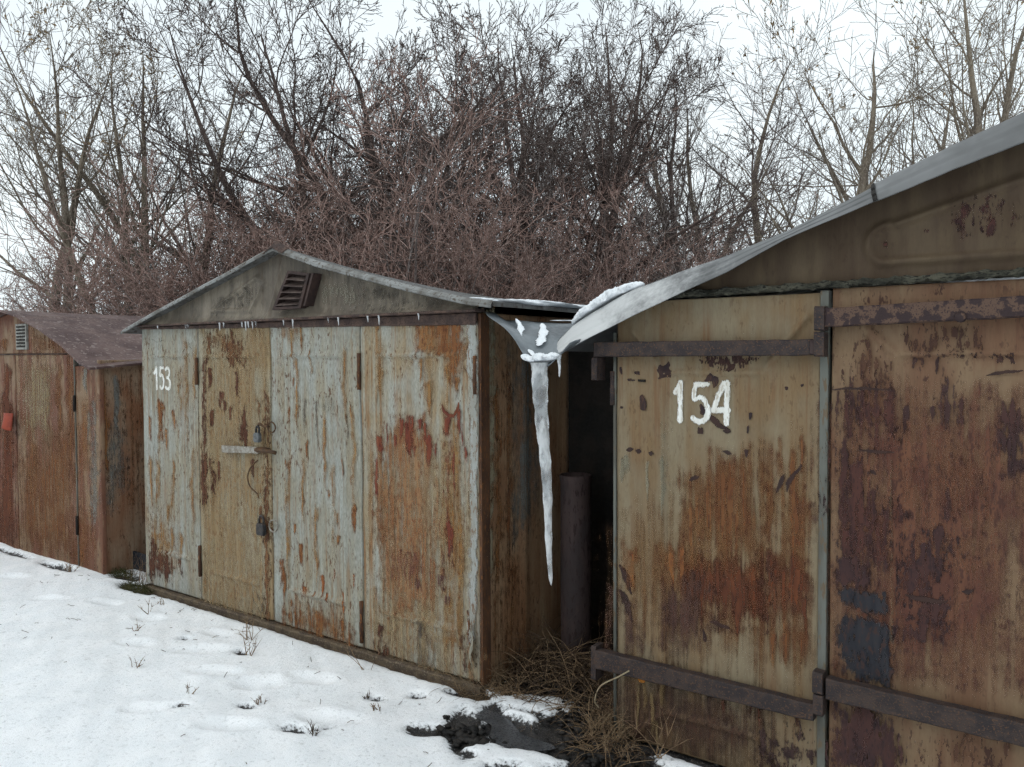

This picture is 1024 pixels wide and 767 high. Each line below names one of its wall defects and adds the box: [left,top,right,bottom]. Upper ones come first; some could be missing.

corrosion [951,194,1014,237]
corrosion [0,364,19,545]
corrosion [104,342,356,646]
corrosion [371,325,477,683]
corrosion [634,332,969,675]
corrosion [996,398,1024,480]
corrosion [749,702,907,767]
corrosion [919,733,1009,767]